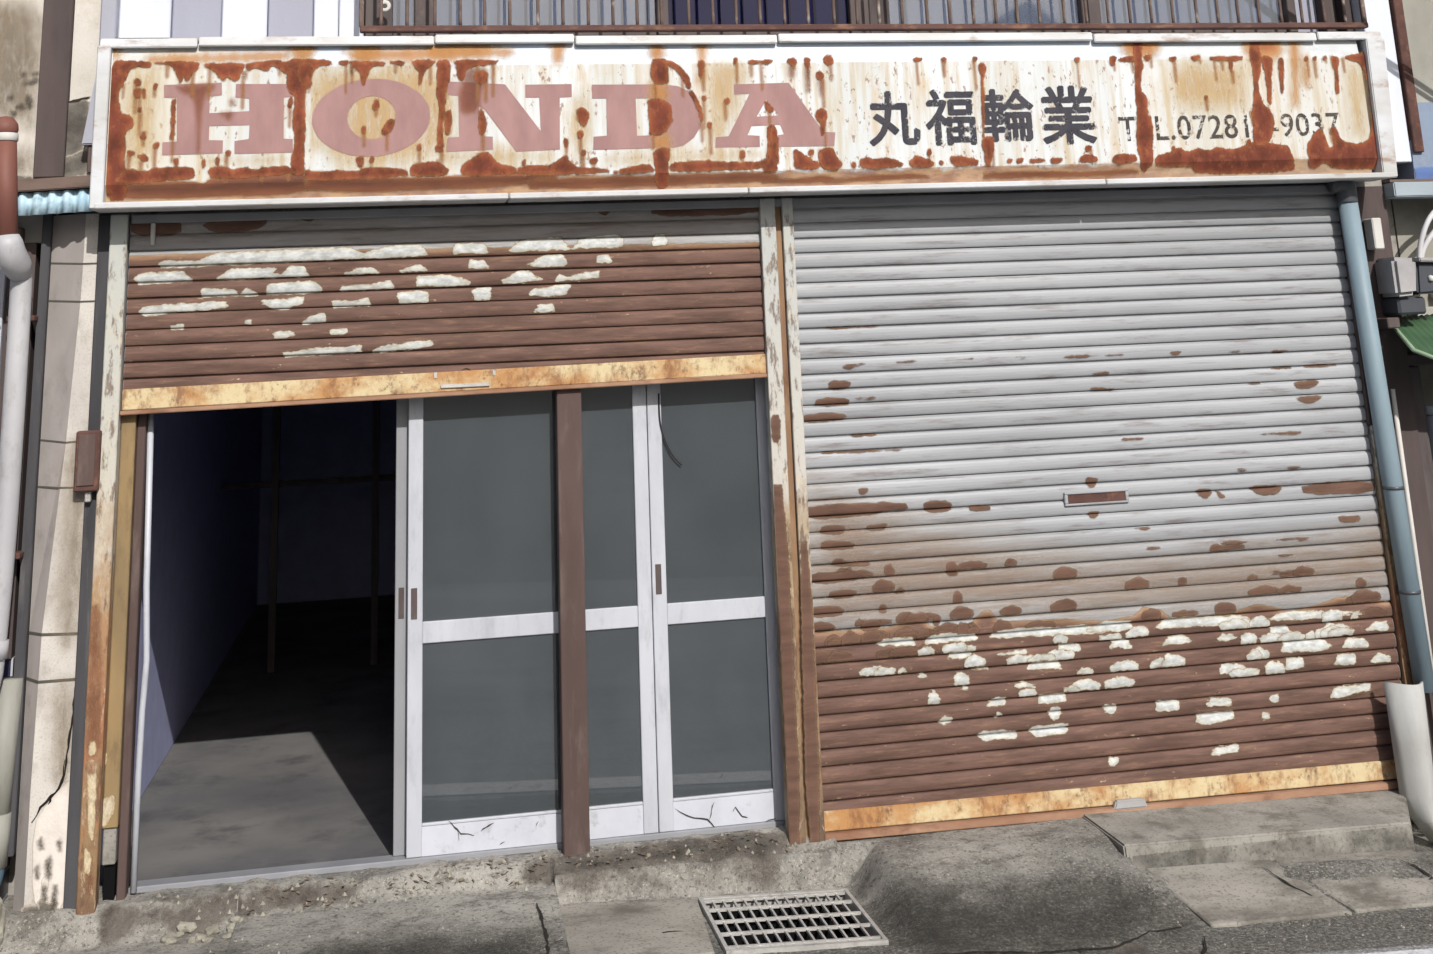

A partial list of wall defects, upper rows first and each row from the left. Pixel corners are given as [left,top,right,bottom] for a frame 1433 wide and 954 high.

corrosion [106,42,1378,201]
corrosion [123,211,765,390]
corrosion [1091,354,1123,391]
corrosion [1272,350,1336,403]
corrosion [771,415,781,443]
corrosion [822,433,899,454]
corrosion [1238,468,1282,495]
corrosion [1302,481,1375,495]
corrosion [86,606,102,774]
corrosion [774,484,1401,846]
crack [31,687,75,823]
crack [676,803,776,827]